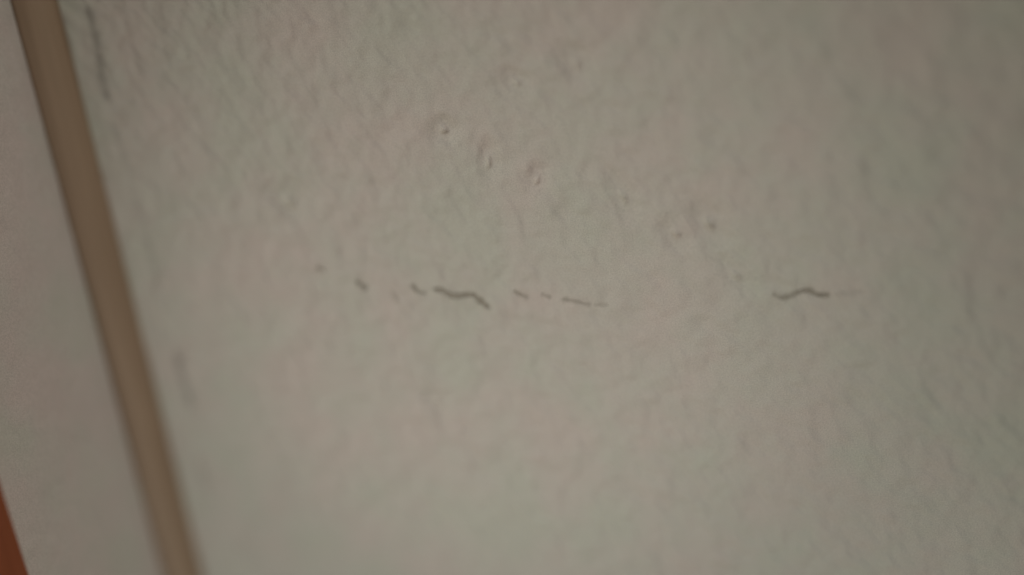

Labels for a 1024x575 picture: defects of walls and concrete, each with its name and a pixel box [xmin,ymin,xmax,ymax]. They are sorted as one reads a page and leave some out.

crack [412,285,489,308]
crack [796,289,828,297]